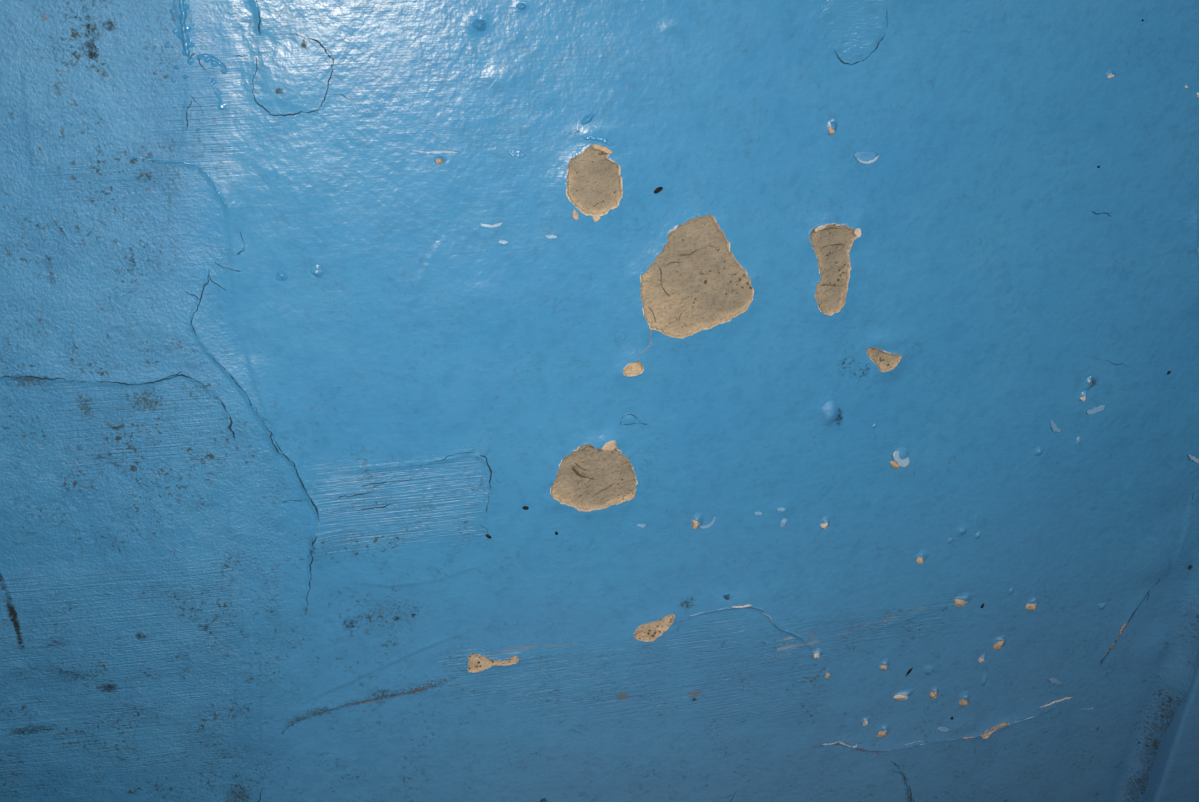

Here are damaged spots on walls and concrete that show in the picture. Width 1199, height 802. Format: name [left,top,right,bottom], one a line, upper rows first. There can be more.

crack [238,14,354,116]
peeling [564,136,625,222]
crack [185,236,245,331]
peeling [638,213,756,340]
peeling [807,222,862,317]
peeling [864,346,903,374]
crack [4,359,492,611]
peeling [549,440,639,513]
peeling [466,652,521,673]
peeling [632,613,698,643]